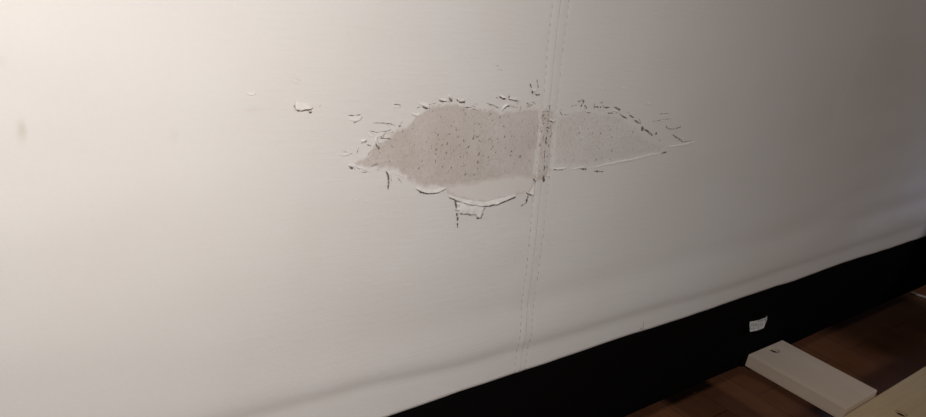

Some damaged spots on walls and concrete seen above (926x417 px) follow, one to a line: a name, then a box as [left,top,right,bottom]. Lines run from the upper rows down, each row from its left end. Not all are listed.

peeling [341,94,544,207]